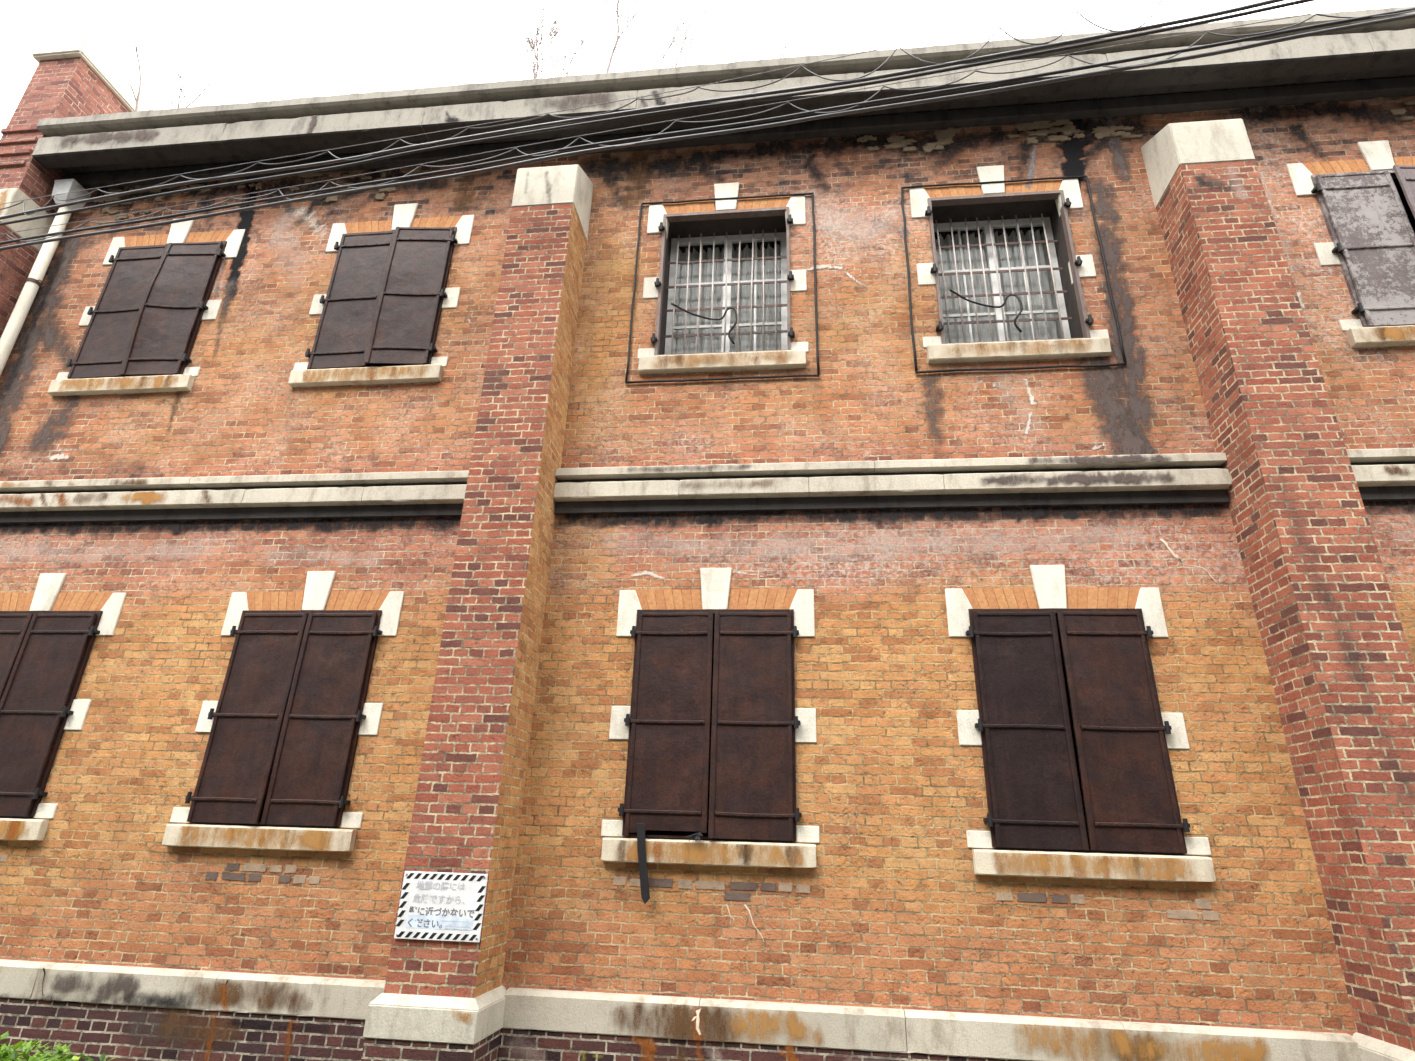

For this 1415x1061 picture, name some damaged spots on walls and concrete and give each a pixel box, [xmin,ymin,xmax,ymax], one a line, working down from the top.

leakage [1289,124,1323,157]
leakage [805,154,826,190]
leakage [1386,466,1409,474]
corrosion [181,826,332,851]
corrosion [618,840,803,866]
corrosion [631,1037,656,1061]